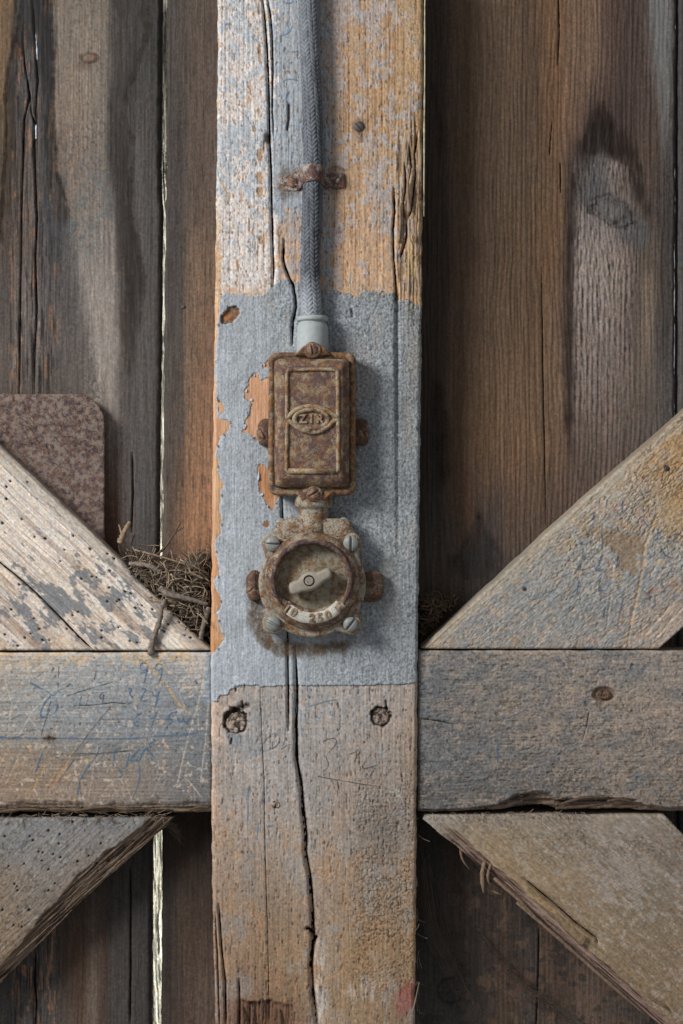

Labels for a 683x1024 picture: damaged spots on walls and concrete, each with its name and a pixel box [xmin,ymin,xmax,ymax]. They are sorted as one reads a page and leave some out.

crack [392,138,417,301]
peeling [211,306,269,654]
peeling [257,464,278,527]
corrosion [249,601,345,656]
crack [287,632,318,1016]